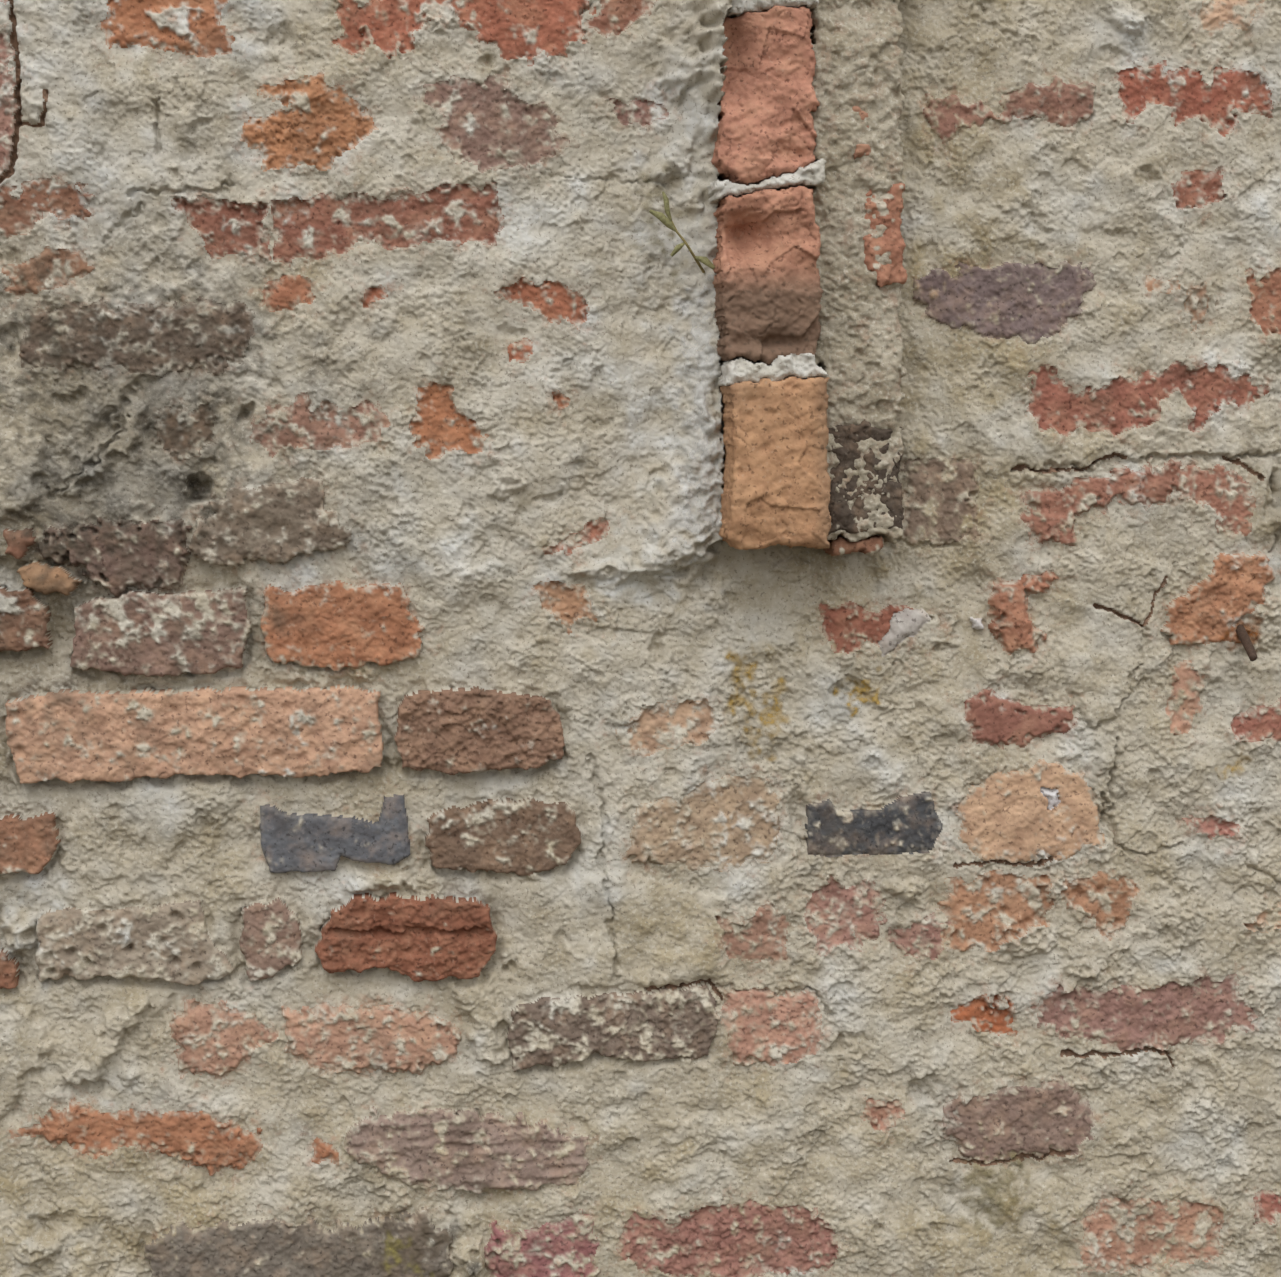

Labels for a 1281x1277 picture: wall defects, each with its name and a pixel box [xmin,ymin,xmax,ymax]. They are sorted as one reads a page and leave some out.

crack [0,0,48,184]
spalling [154,404,218,462]
spalling [250,392,391,458]
spalling [409,381,489,460]
crack [1011,452,1127,474]
crack [1222,456,1266,481]
spalling [0,477,565,784]
spalling [0,812,61,874]
spalling [260,794,581,876]
spalling [0,892,497,1079]
spalling [507,983,824,1072]
crack [1060,1046,1175,1069]